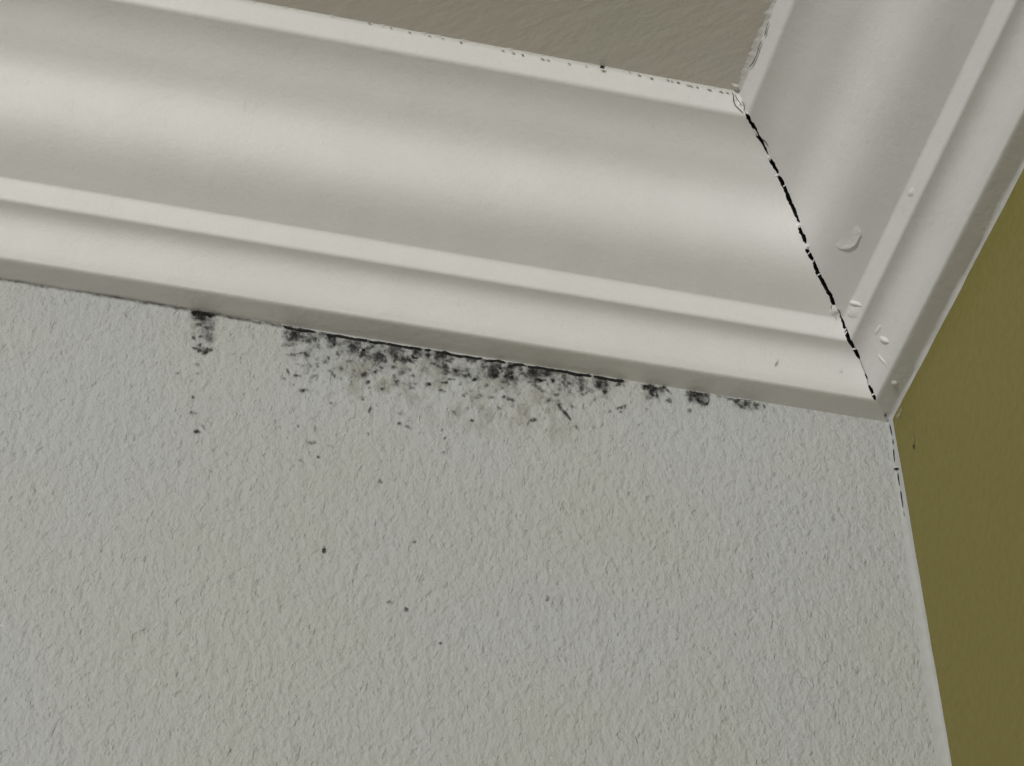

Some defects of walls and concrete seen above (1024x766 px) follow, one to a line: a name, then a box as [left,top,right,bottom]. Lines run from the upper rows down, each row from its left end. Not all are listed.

crack [630,22,876,401]
water stain [192,310,212,354]
water stain [285,326,620,401]
crack [283,325,646,385]